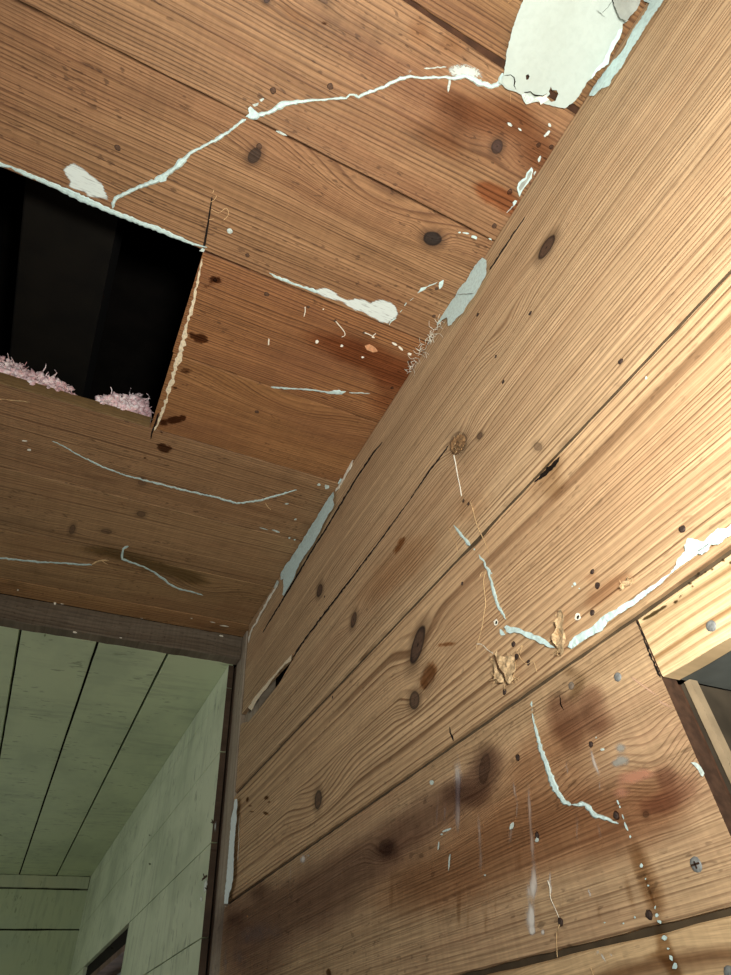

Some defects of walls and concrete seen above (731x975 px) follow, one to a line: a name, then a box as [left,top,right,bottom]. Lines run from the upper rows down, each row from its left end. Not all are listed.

peeling [589,0,663,96]
peeling [437,258,487,326]
crack [52,441,296,510]
crack [0,546,202,595]
peeling [274,492,334,596]
leakage [528,867,544,935]